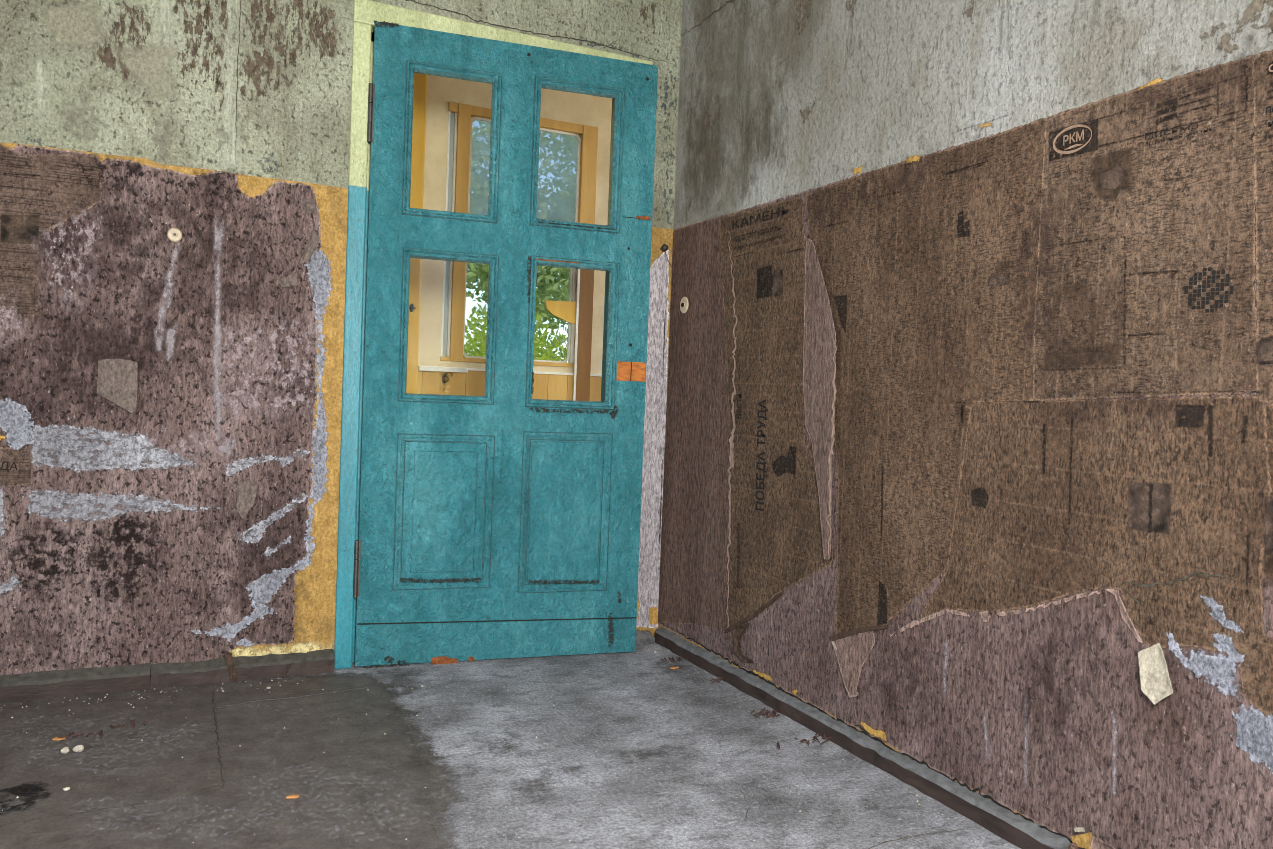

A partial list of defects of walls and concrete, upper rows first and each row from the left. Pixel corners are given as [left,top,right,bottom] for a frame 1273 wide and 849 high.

peeling [92,6,151,81]
crack [234,0,242,144]
peeling [173,0,337,139]
crack [406,0,735,64]
peeling [1200,0,1273,53]
peeling [0,398,197,474]
peeling [192,230,333,657]
peeling [25,490,219,522]
peeling [0,572,20,594]
peeling [1104,588,1144,643]
peeling [1166,593,1273,774]
peeling [860,721,887,741]